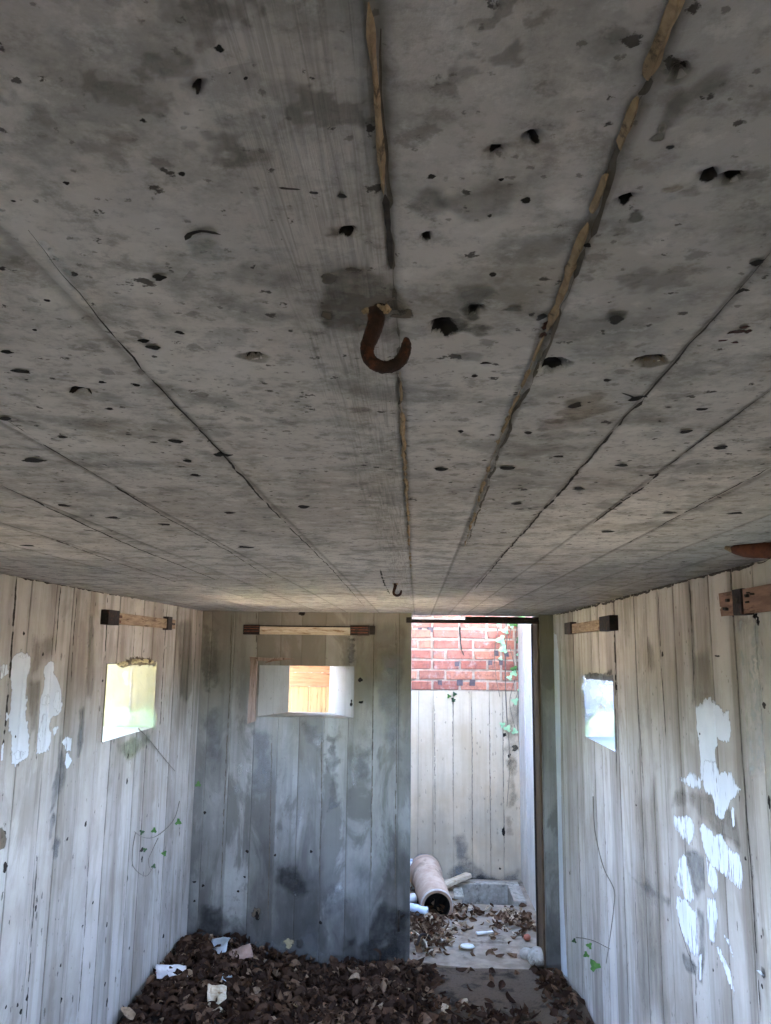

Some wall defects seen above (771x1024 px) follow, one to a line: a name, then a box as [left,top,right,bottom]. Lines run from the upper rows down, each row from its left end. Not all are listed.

crack [474,253,771,590]
peeling [0,652,72,768]
peeling [676,696,741,827]
leakage [278,868,307,895]
leakage [362,906,410,962]
peeling [674,815,743,990]